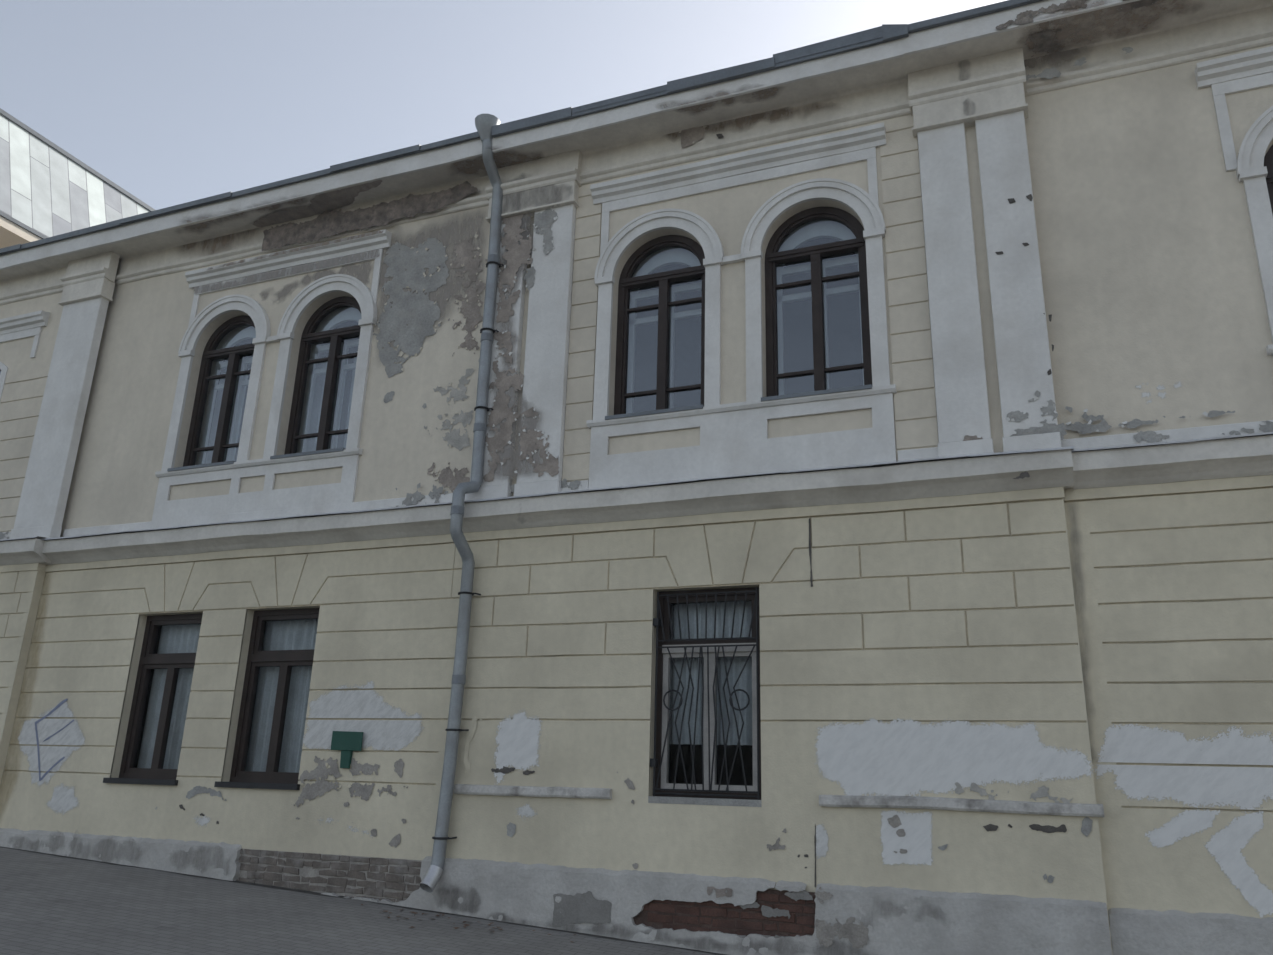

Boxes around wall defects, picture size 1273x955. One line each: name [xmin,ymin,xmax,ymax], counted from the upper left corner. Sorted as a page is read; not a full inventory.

spalling [996,0,1087,29]
spalling [1116,0,1159,12]
spalling [679,126,724,148]
spalling [253,180,478,251]
peeling [373,208,580,507]
peeling [1006,390,1273,443]
crack [807,518,815,587]
peeling [291,756,408,820]
flaking render [633,886,869,949]